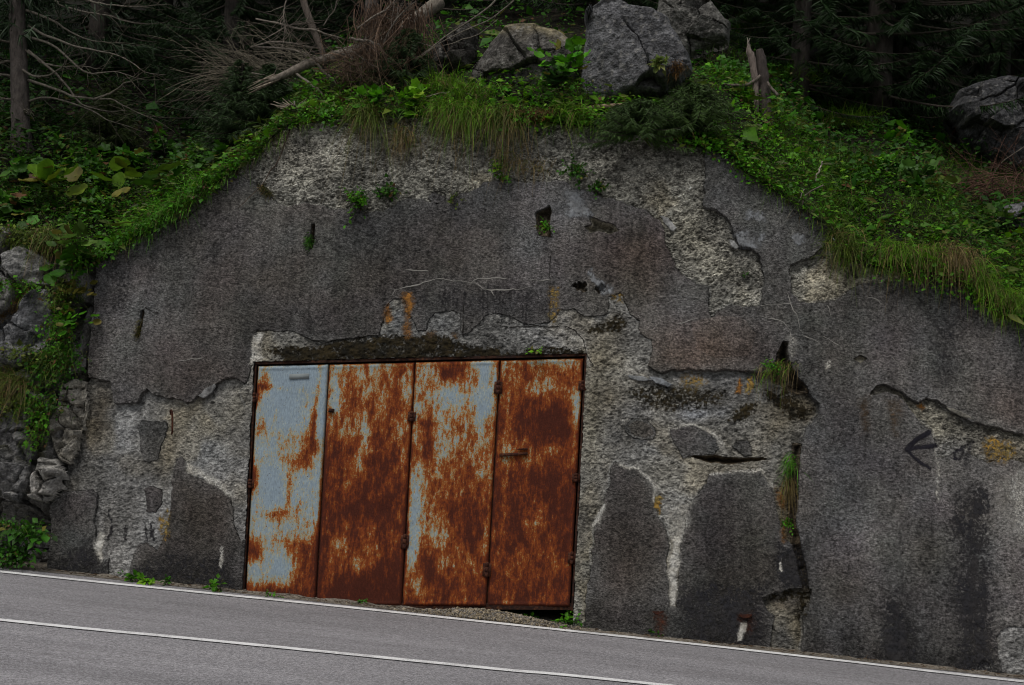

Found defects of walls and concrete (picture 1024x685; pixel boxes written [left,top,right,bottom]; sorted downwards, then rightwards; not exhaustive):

flaking render [234,115,766,318]
water stain [186,463,232,497]
flaking render [54,271,818,655]
water stain [620,464,657,503]
water stain [135,547,235,587]
water stain [666,503,767,643]
water stain [776,544,807,588]